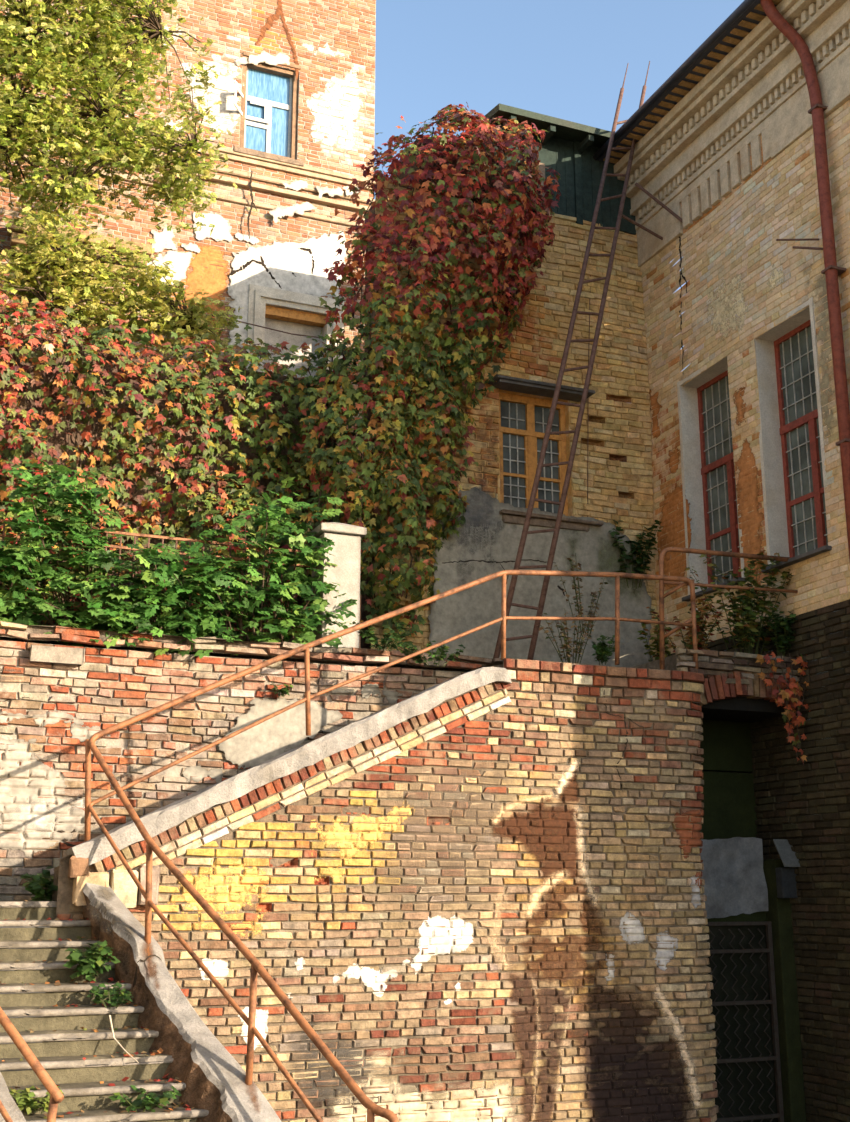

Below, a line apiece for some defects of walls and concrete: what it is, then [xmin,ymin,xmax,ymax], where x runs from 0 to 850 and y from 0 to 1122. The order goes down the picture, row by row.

flaking render [180,50,290,140]
flaking render [303,43,367,150]
flaking render [146,207,347,348]
crack [229,171,315,289]
flaking render [269,179,359,223]
peeling [733,387,763,582]